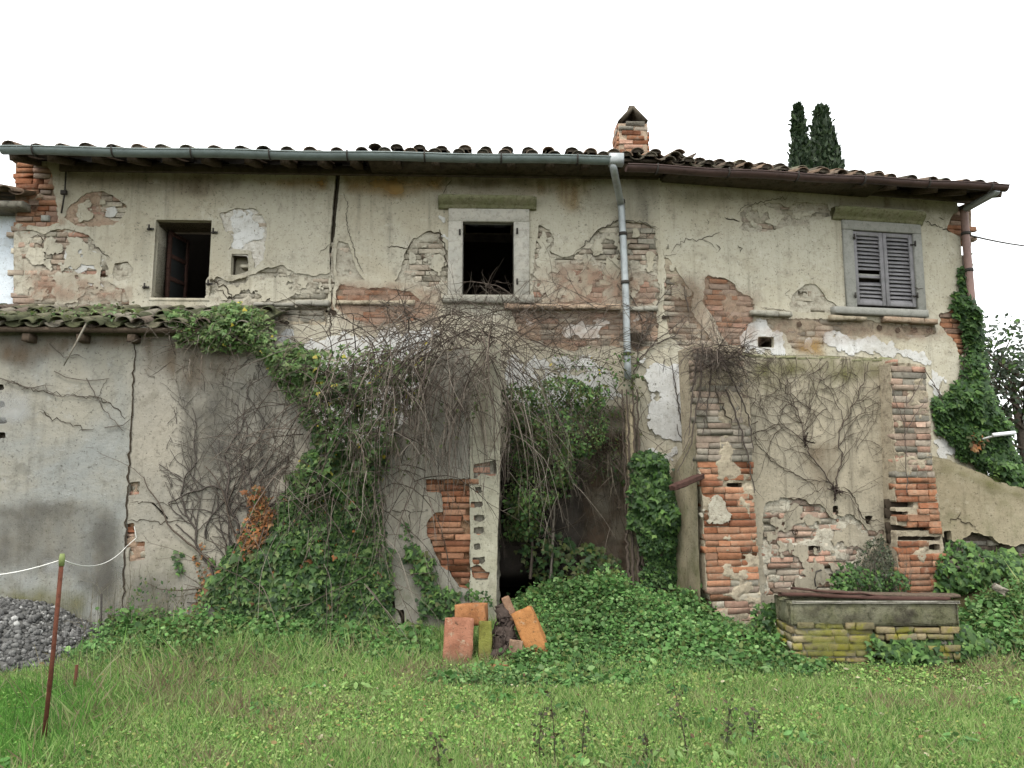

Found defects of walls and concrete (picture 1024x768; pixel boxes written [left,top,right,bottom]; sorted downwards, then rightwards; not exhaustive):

flaking render [6,161,134,307]
crack [320,163,363,271]
flaking render [205,208,448,453]
flaking render [505,221,966,461]
crack [4,333,193,613]
flaking render [426,474,480,589]
flaking render [761,498,885,595]